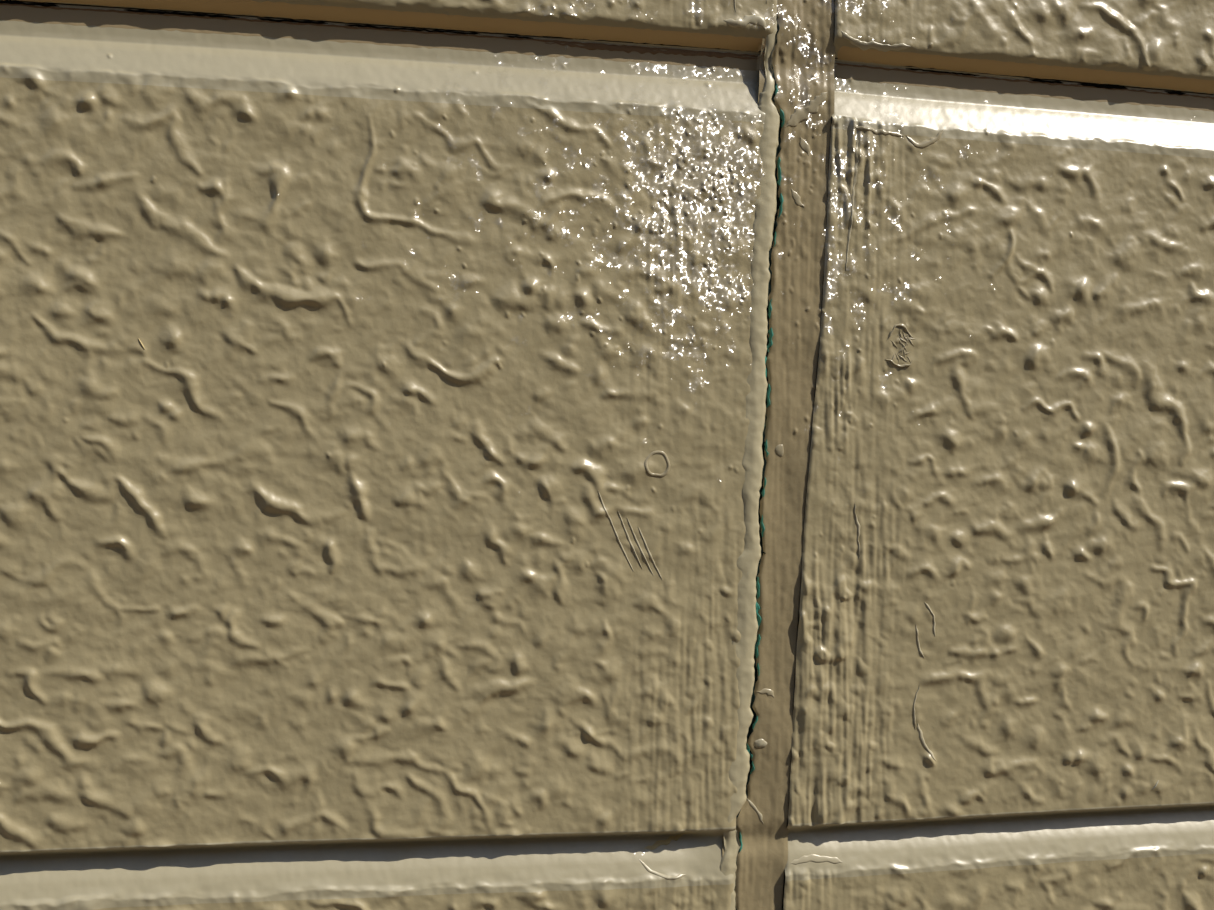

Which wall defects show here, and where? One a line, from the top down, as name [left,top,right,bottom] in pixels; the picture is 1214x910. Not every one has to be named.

crack [734,16,782,910]